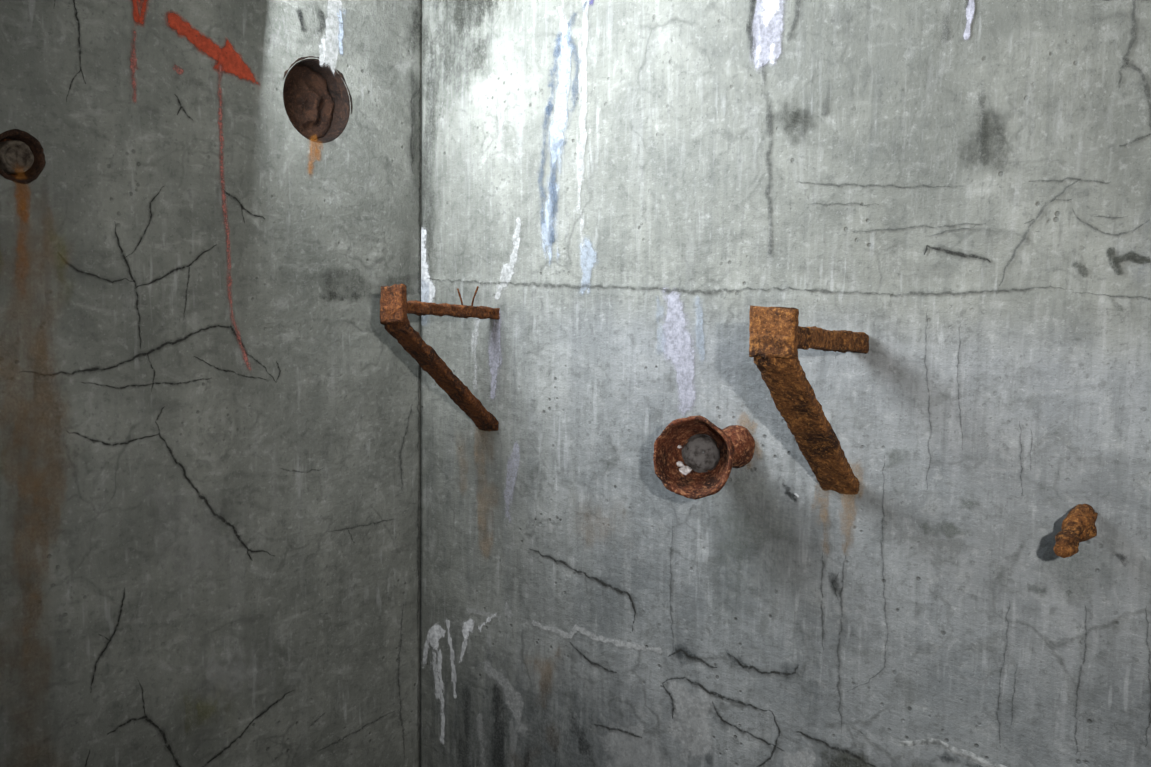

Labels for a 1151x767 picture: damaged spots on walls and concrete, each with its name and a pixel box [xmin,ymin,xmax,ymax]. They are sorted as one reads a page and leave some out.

leakage [746,0,798,68]
crack [1119,1,1151,146]
crack [410,91,833,294]
crack [22,186,281,560]
crack [91,587,125,690]
crack [85,680,293,767]
leakage [423,625,445,744]
leakage [462,614,496,639]
crack [530,549,636,632]
crack [570,642,617,673]
crack [594,724,642,738]
crack [662,456,887,767]